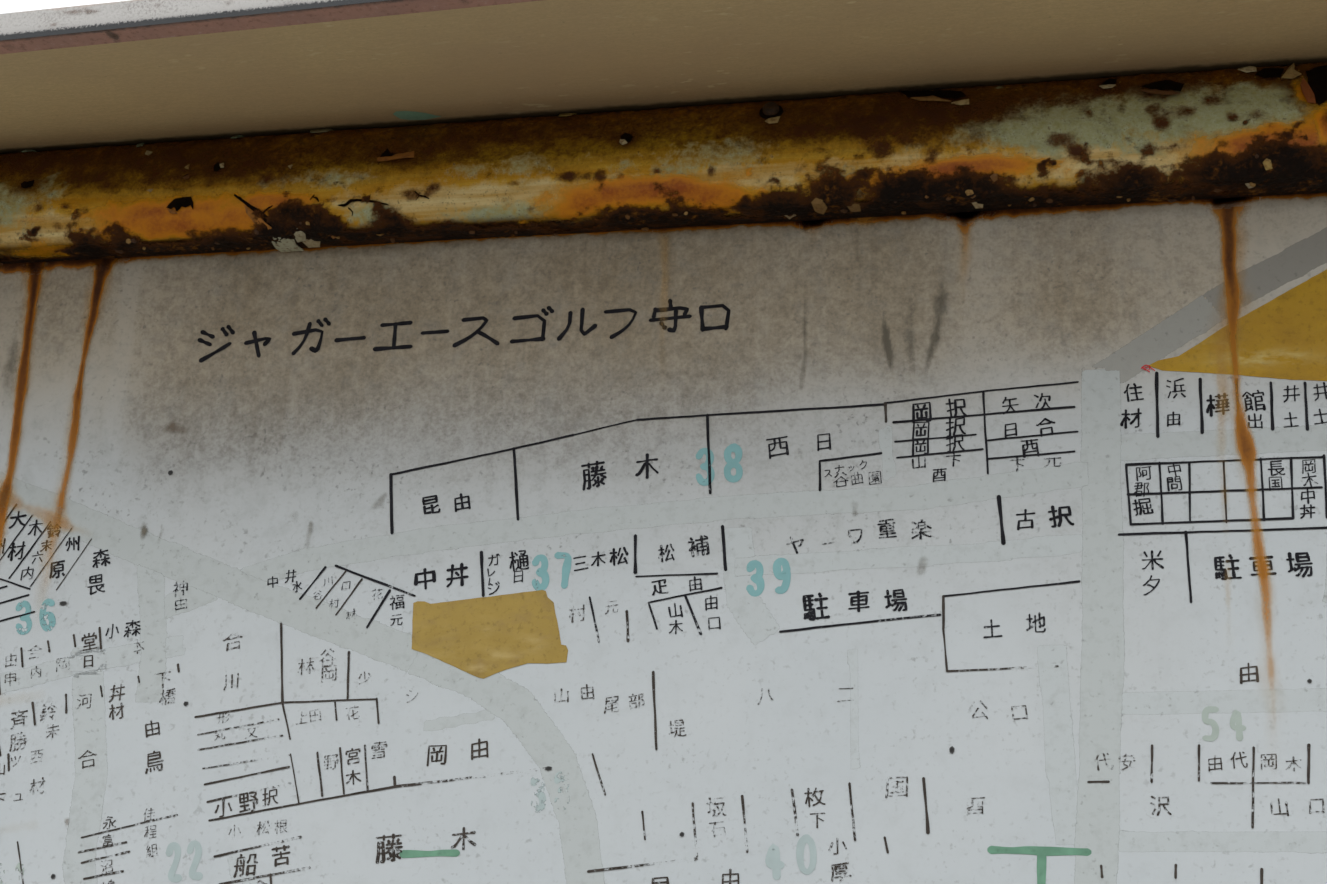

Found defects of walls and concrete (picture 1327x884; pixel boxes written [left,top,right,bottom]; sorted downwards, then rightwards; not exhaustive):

peeling [1281,63,1316,104]
peeling [272,231,336,252]
rust [0,74,1327,634]
damp [883,322,892,366]
damp [928,294,945,358]